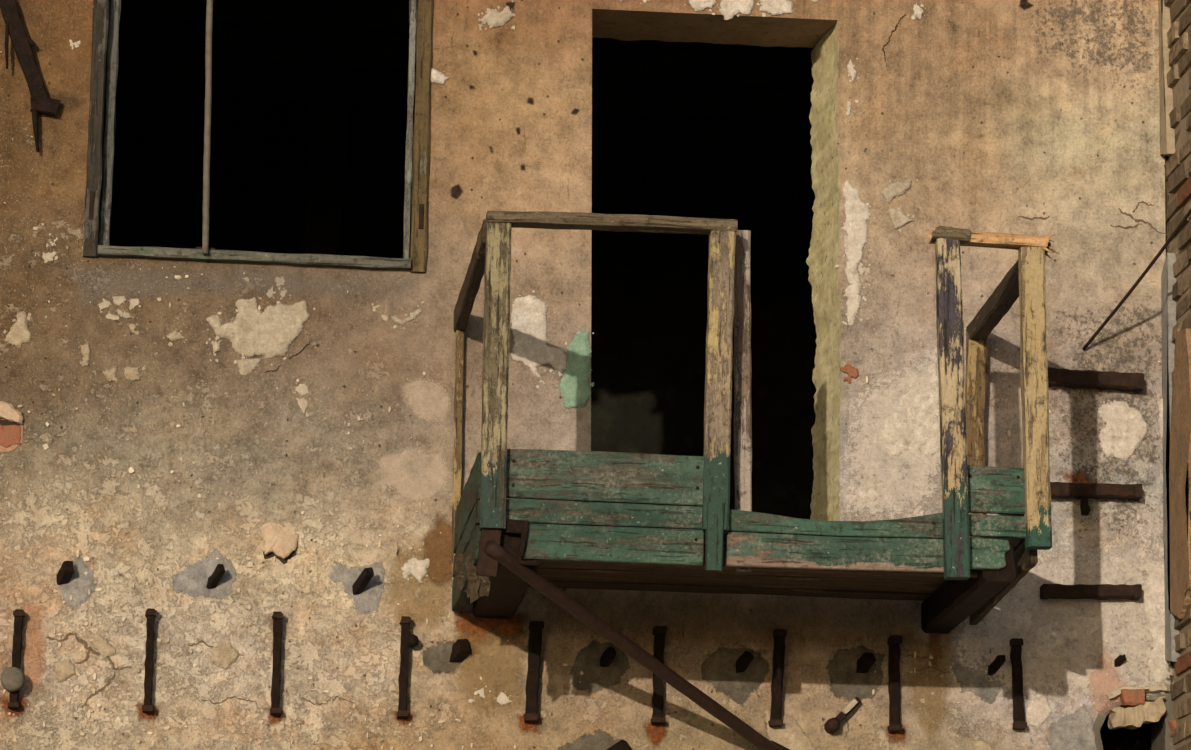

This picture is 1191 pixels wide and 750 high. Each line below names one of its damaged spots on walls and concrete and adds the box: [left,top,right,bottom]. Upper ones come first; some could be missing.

peeling [684,0,795,20]
peeling [847,58,859,82]
crack [882,14,906,67]
peeling [835,168,918,329]
crack [1018,214,1050,222]
crack [1110,156,1169,251]
peeling [206,276,315,375]
peeling [510,290,594,412]
spalling [0,401,78,452]
peeling [1090,395,1163,469]
corrosion [456,611,526,657]
peeling [986,558,1176,750]